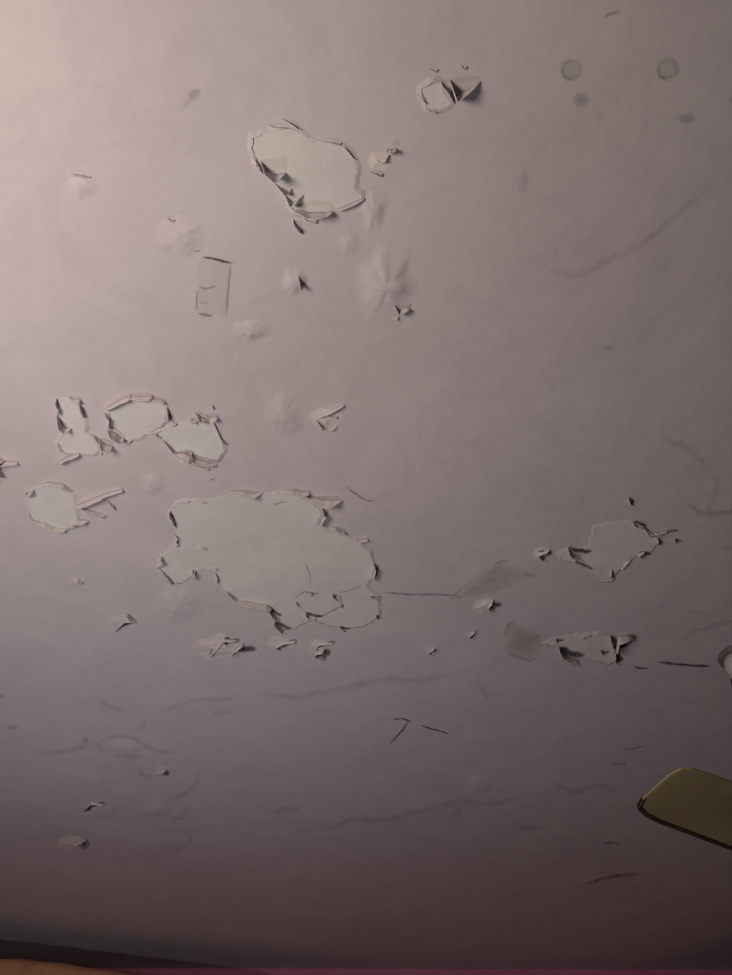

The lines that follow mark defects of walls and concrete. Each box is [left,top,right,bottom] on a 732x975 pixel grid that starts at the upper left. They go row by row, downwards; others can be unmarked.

peeling [416,69,481,115]
peeling [246,119,397,234]
peeling [54,395,228,471]
peeling [309,405,345,434]
peeling [25,482,124,533]
peeling [156,490,382,651]
peeling [532,519,681,583]
peeling [192,632,254,660]
peeling [307,639,335,660]
peeling [541,631,635,666]